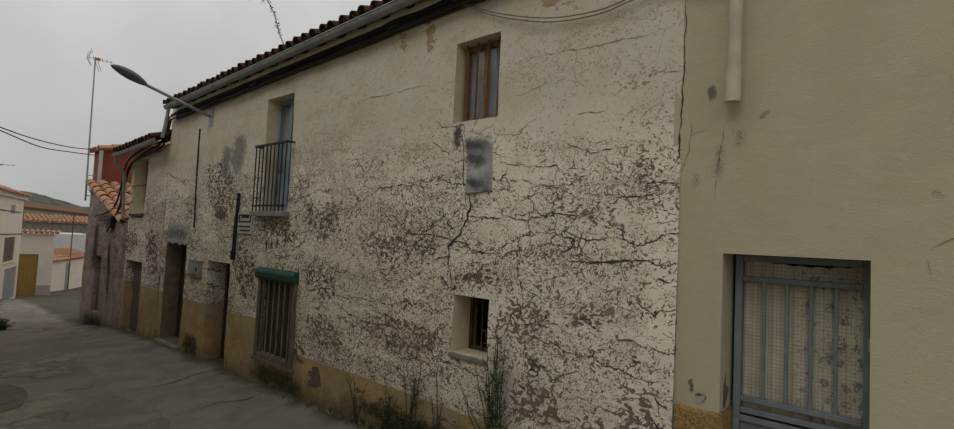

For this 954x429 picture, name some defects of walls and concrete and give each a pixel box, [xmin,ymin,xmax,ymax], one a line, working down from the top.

crack [519,6,725,200]
crack [276,158,336,258]
crack [396,120,677,358]
crack [323,293,437,350]
crack [514,323,674,427]